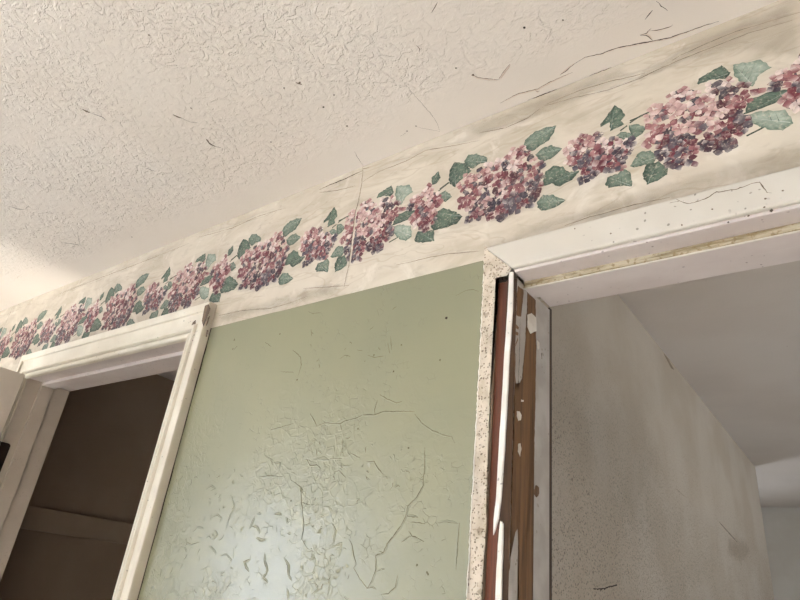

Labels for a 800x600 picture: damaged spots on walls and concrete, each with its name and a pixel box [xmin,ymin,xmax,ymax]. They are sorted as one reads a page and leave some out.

crack [501,1,719,103]
crack [671,182,768,204]
crack [307,395,455,478]
spalling [466,246,512,600]
peeling [509,286,540,600]
crack [259,451,460,598]